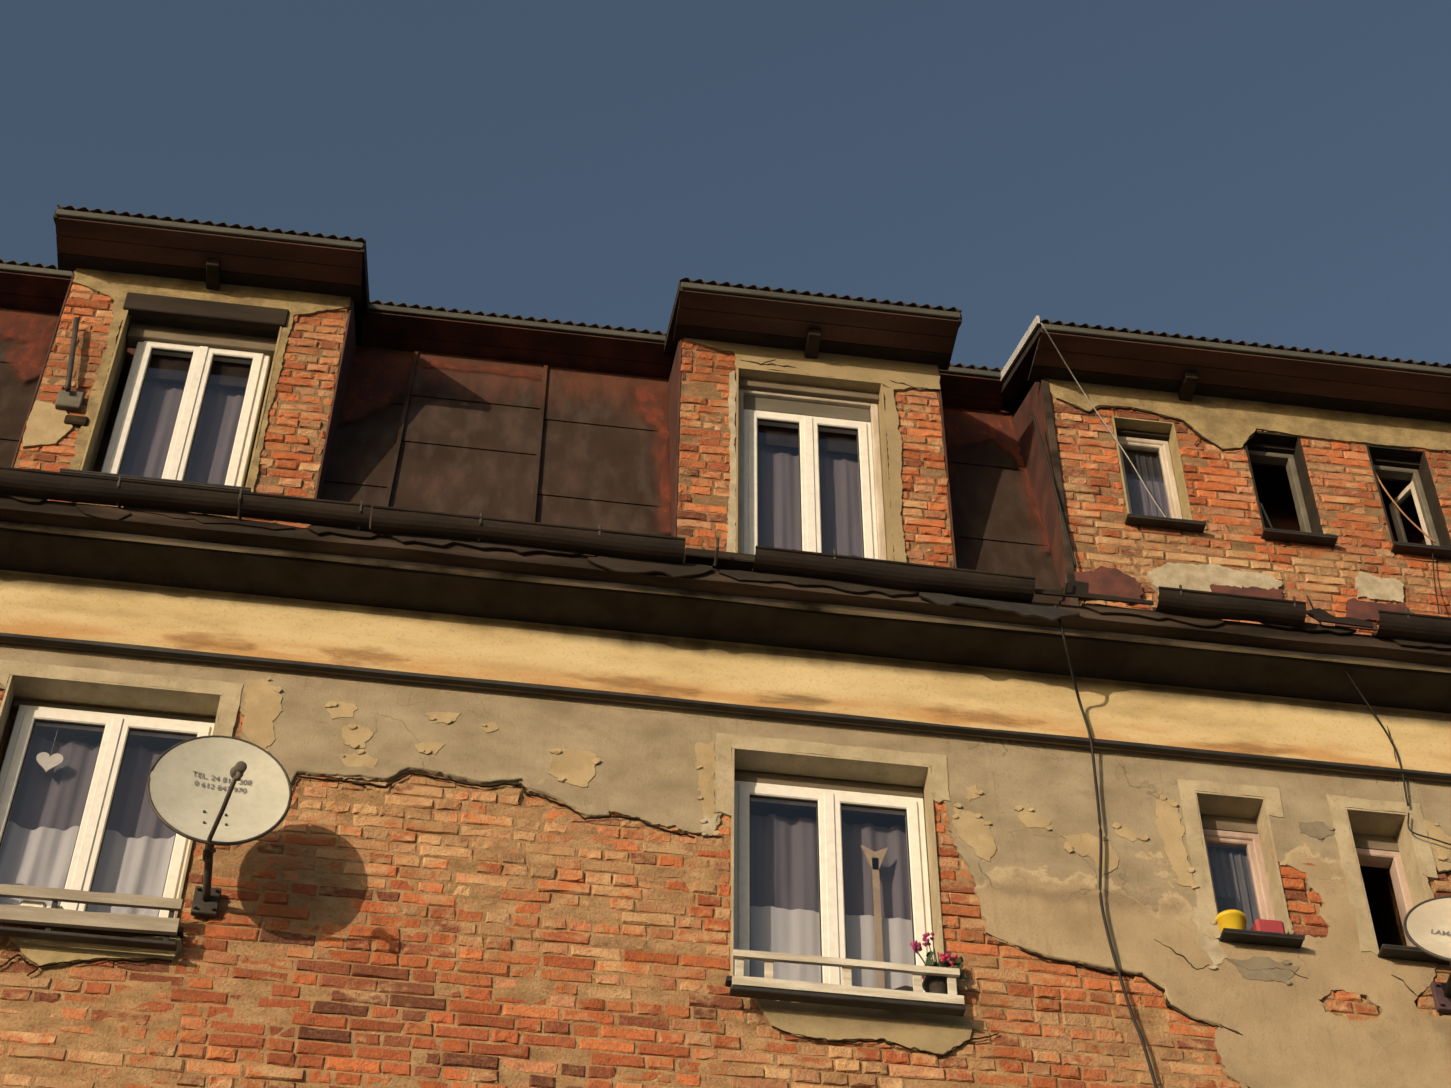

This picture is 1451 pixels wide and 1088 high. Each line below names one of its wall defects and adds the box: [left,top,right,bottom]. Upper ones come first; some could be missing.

rust [0,312,53,381]
rust [942,405,1052,550]
peeling [232,677,283,751]
peeling [589,678,698,694]
spalling [0,701,1240,1088]
peeling [1014,795,1299,985]
spalling [1270,849,1328,938]
spalling [1321,990,1379,1022]
spalling [1416,963,1451,1017]